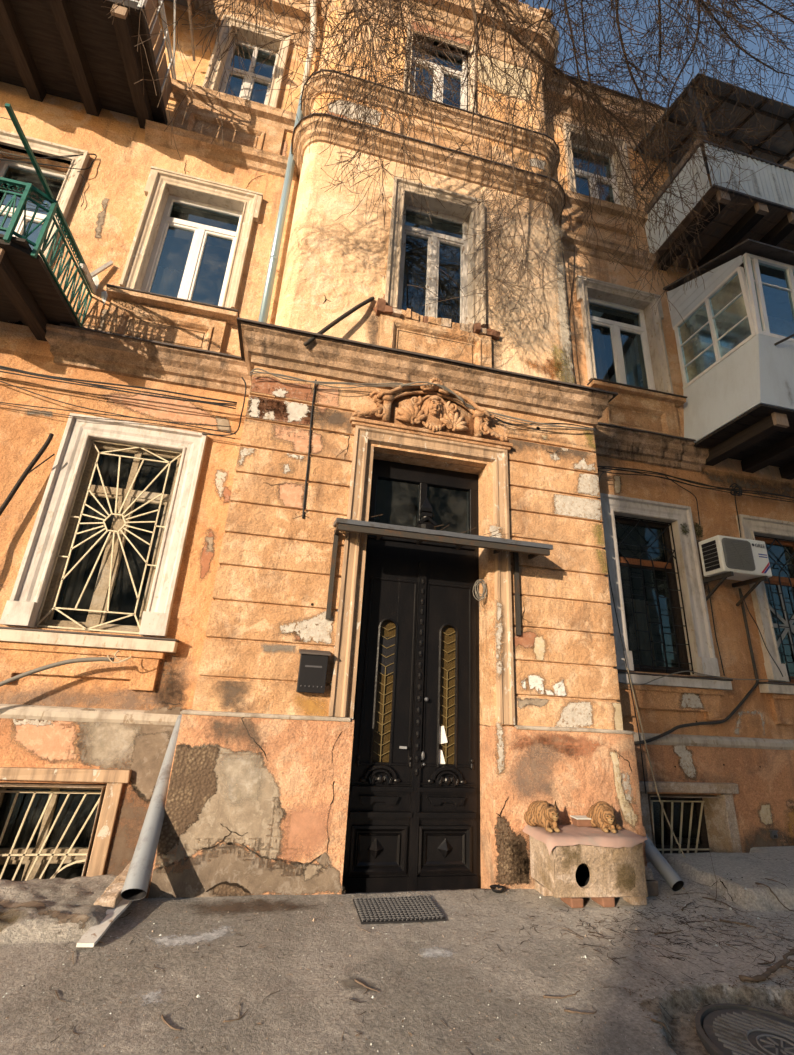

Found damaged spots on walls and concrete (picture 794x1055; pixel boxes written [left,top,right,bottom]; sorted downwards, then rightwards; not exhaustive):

peeling [101,392,232,432]
peeling [248,374,340,508]
peeling [214,470,231,503]
peeling [553,458,602,520]
peeling [278,611,335,644]
peeling [555,700,594,728]
peeling [678,693,704,709]
peeling [673,745,697,780]
flaking render [11,706,287,869]
crack [201,732,342,874]
flaking render [494,815,530,886]
crack [206,881,249,893]